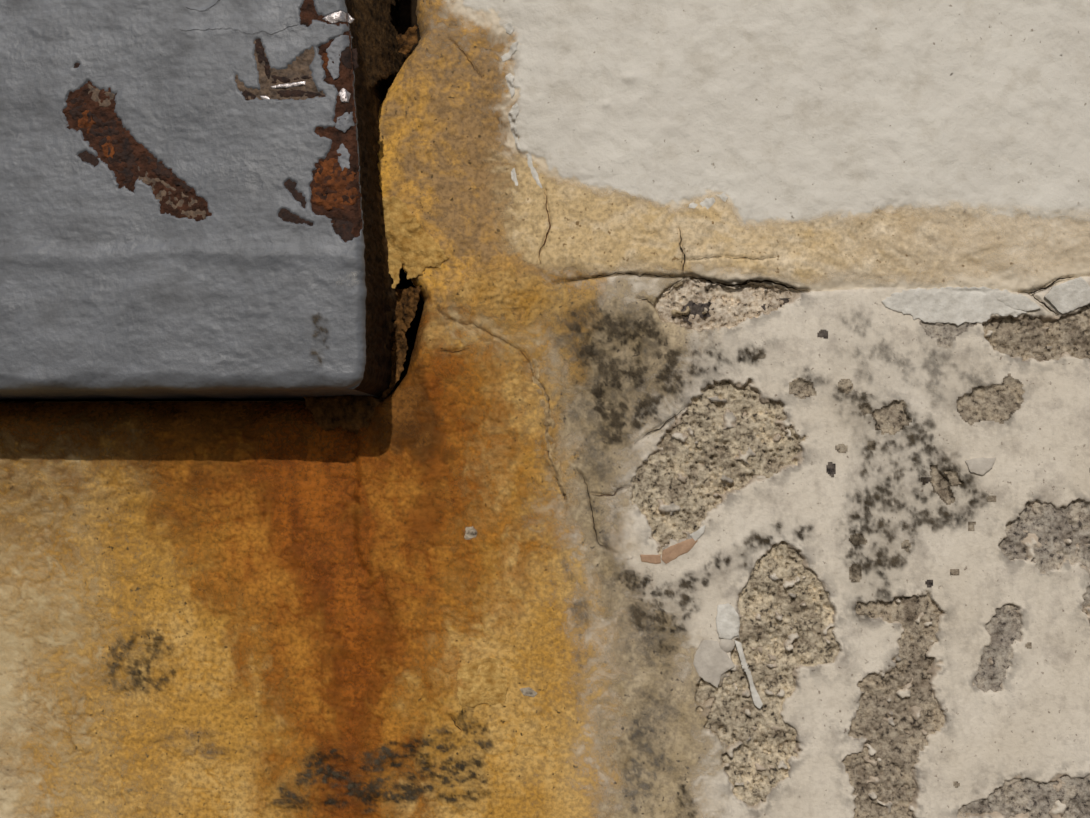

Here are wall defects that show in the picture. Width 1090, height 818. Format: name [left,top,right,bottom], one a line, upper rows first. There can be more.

rust [62,81,212,221]
rust [141,0,539,818]
crack [539,191,808,305]
spalling [631,380,805,564]
spalling [654,277,801,331]
damp [377,0,1081,818]
spalling [919,277,1090,361]
damp [0,414,316,818]
spalling [693,541,840,806]
spalling [842,580,945,818]
spalling [973,604,1032,692]
spalling [958,774,1090,818]